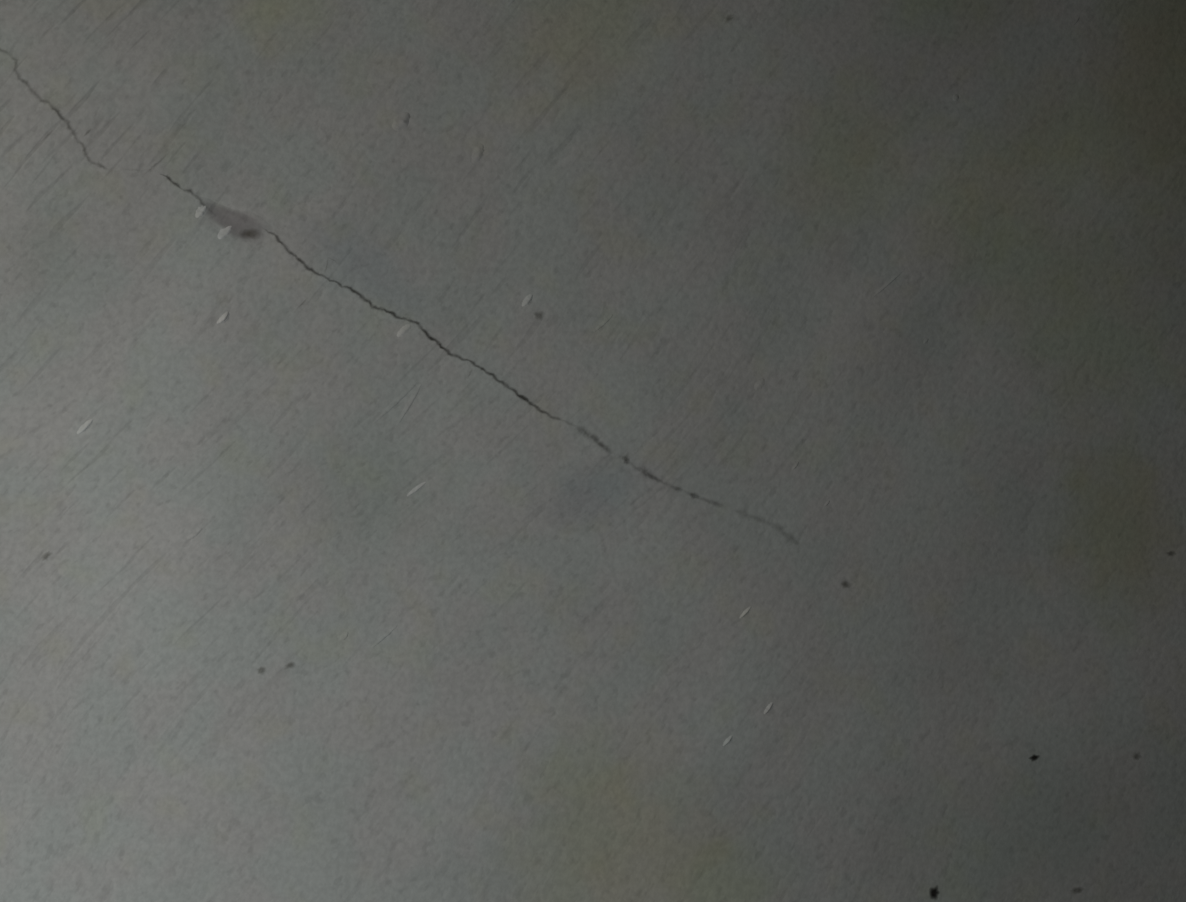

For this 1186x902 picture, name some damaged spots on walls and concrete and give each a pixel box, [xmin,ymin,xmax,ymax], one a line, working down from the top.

crack [350,288,451,355]
crack [477,366,532,405]